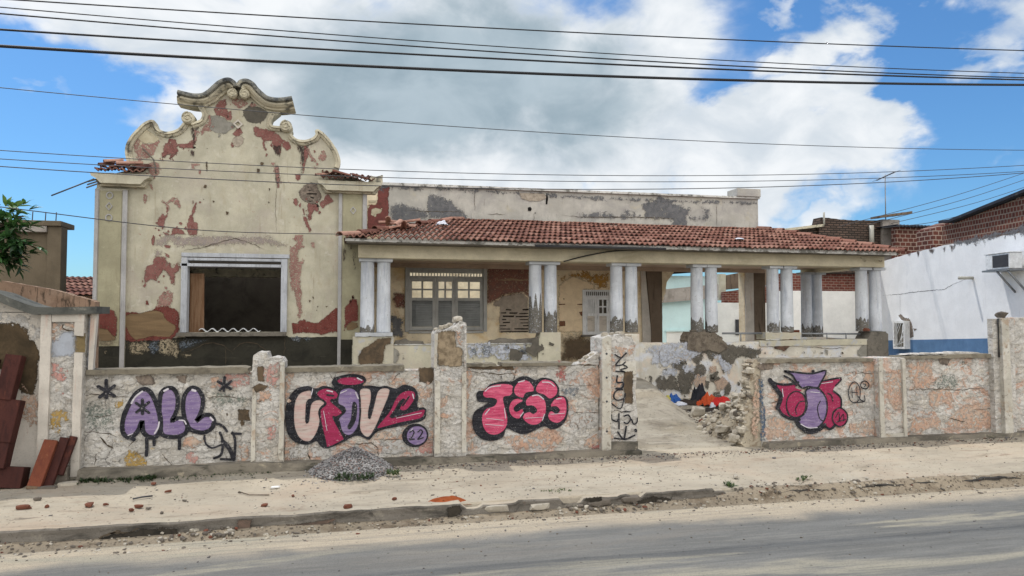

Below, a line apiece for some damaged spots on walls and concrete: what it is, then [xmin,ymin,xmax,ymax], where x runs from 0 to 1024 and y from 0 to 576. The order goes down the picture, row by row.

spalling [99,98,291,357]
peeling [289,146,595,455]
spalling [0,306,86,433]
peeling [267,425,331,460]
peeling [504,346,634,450]
peeling [646,317,991,440]